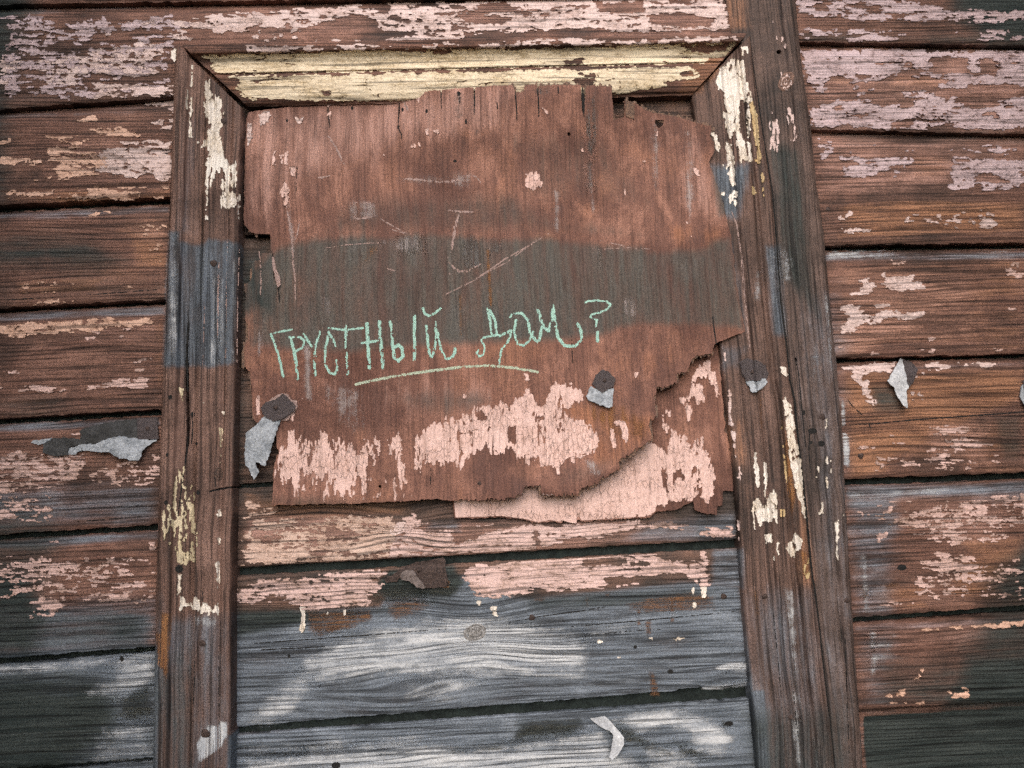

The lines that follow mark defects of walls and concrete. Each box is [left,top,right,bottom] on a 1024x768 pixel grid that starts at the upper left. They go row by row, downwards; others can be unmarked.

peeling [0,0,797,220]
peeling [780,0,1024,178]
peeling [947,144,1024,191]
peeling [0,317,154,340]
peeling [87,358,152,391]
peeling [838,259,926,348]
peeling [0,450,160,523]
peeling [0,466,219,619]
peeling [237,352,810,633]
peeling [782,397,832,518]
peeling [834,514,844,560]
peeling [857,493,1024,606]